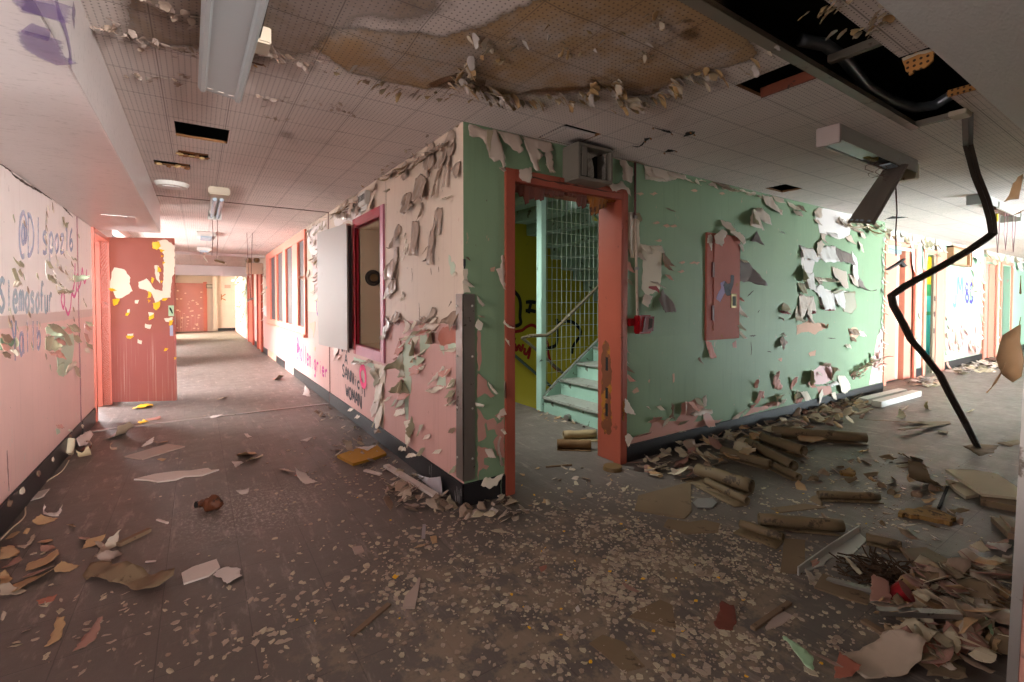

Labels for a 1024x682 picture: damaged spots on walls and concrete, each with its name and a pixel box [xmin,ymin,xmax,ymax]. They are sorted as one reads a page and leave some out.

leakage [126,0,201,47]
peeling [253,32,729,116]
leakage [263,0,758,96]
peeling [738,45,781,78]
peeling [797,0,854,24]
peeling [826,3,895,40]
spalling [948,108,972,121]
peeling [0,202,94,378]
peeling [109,240,175,329]
peeling [298,124,555,489]
peeling [608,157,1024,478]